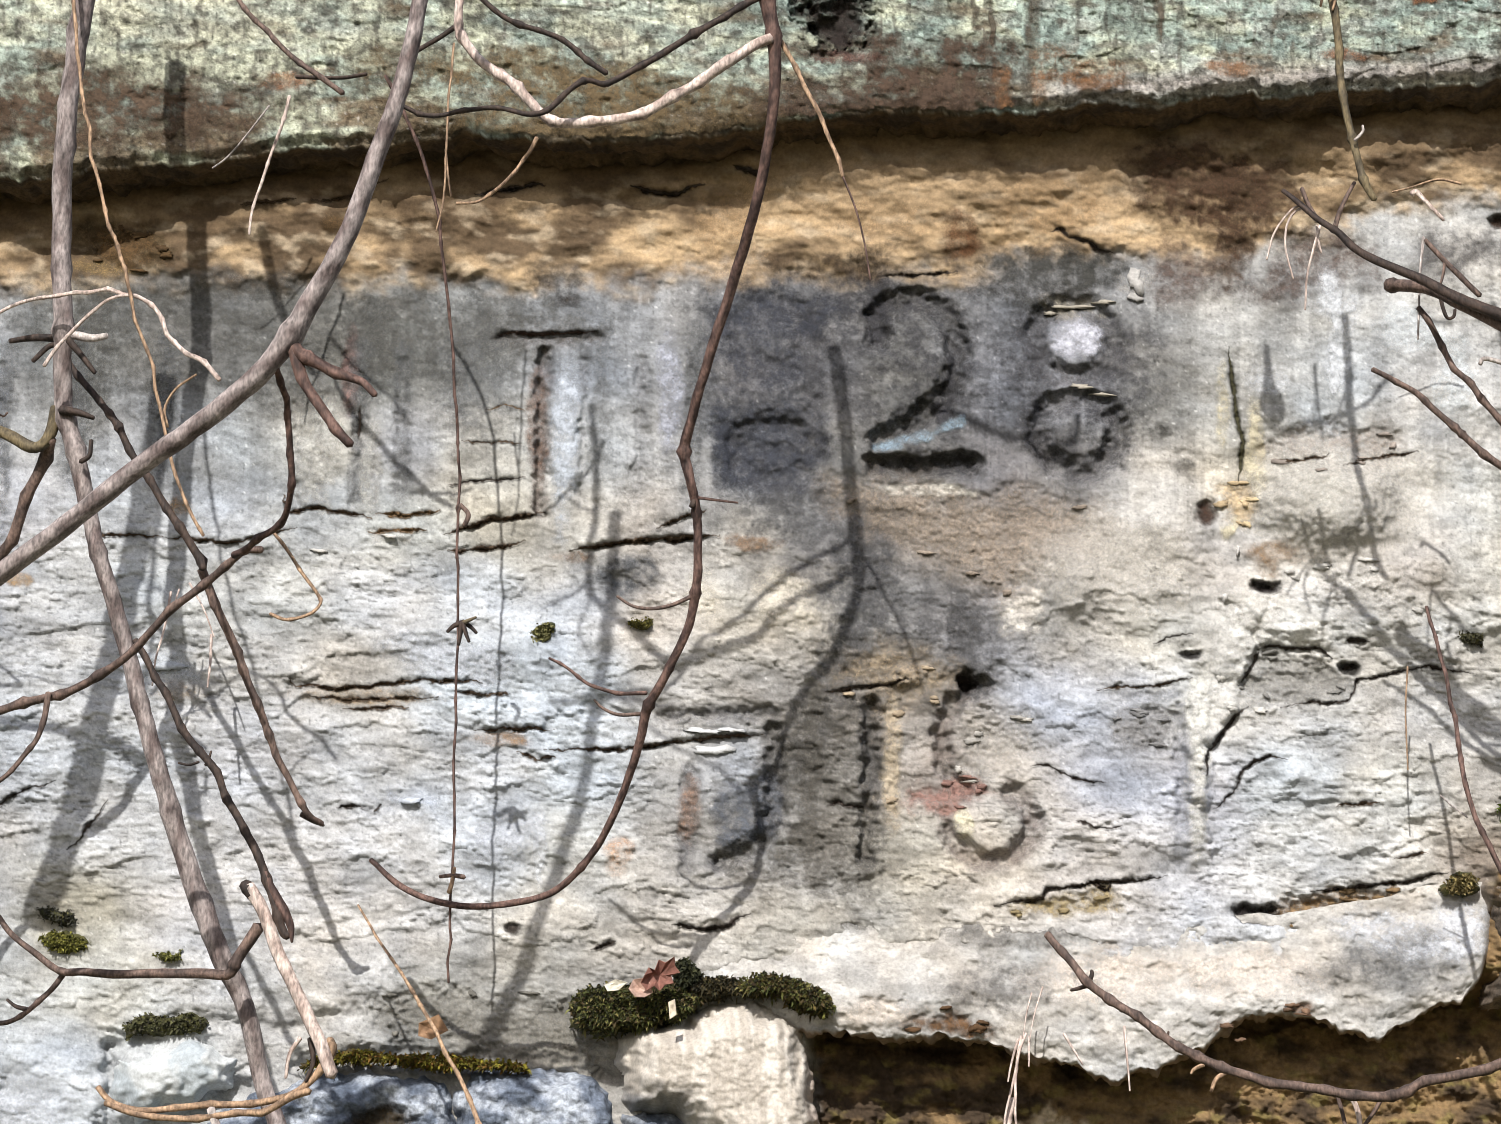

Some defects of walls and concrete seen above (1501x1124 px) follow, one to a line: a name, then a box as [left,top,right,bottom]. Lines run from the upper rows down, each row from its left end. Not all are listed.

crack [1205,637,1471,809]
crack [994,875,1165,907]